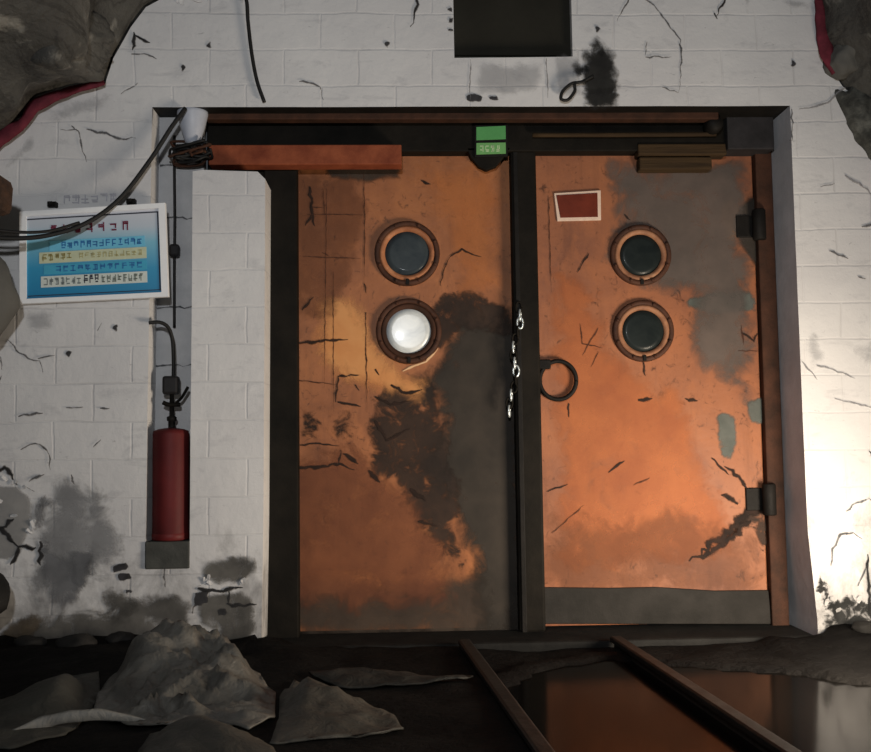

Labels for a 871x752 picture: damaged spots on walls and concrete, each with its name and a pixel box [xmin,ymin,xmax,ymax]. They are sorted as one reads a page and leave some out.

crack [410,0,419,27]
crack [617,0,682,91]
rust [322,300,420,394]
crack [803,362,853,379]
crack [0,519,44,565]
damp [30,485,190,639]
crack [831,532,871,619]